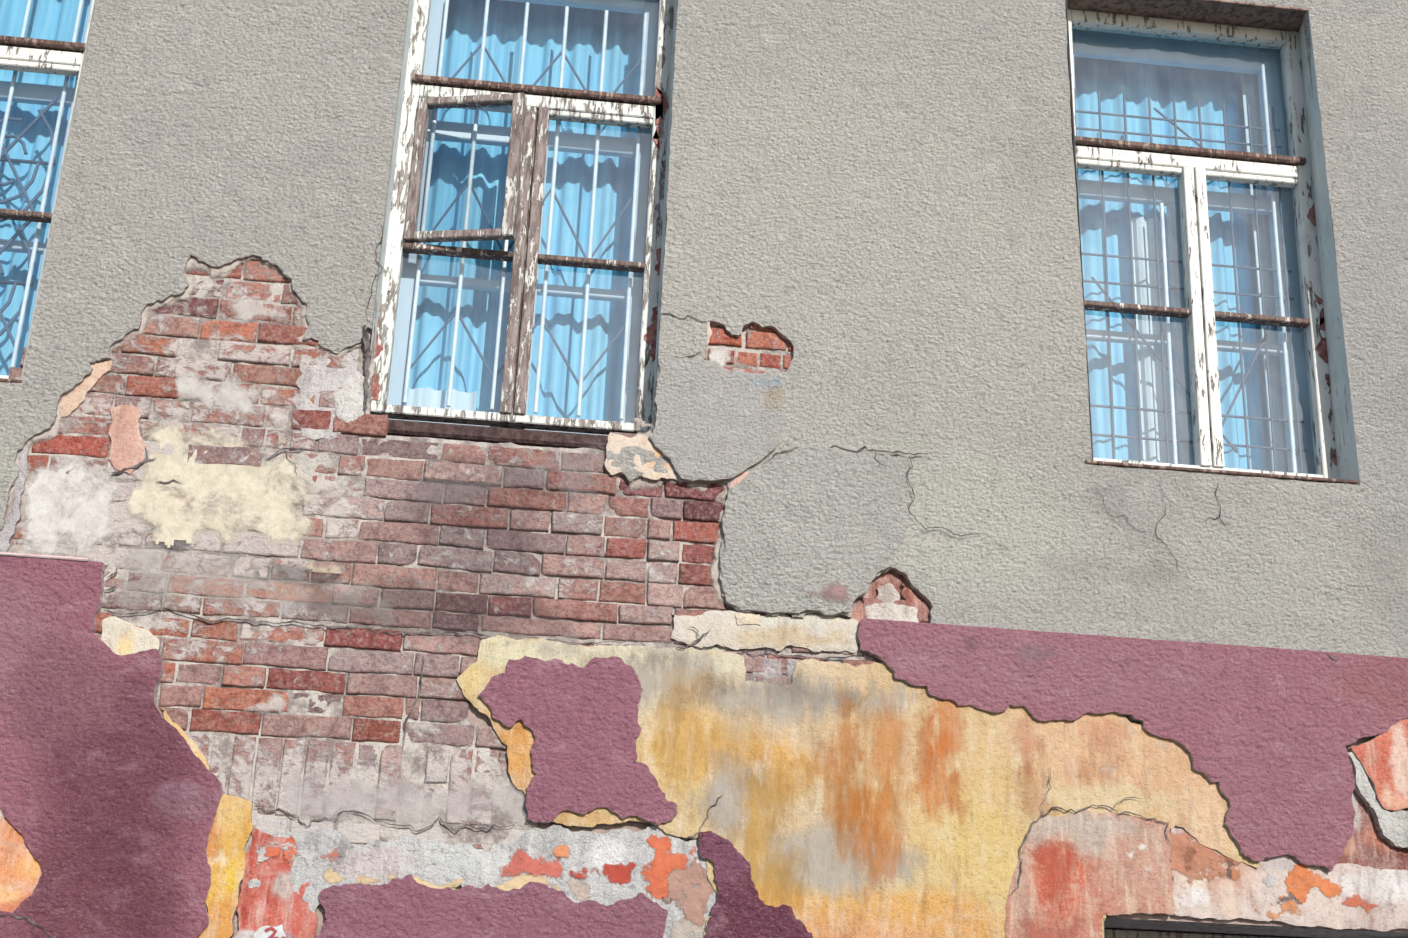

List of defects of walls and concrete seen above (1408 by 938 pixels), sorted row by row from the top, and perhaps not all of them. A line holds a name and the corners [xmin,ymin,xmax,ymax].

peeling [653,87,669,150]
peeling [1307,203,1316,227]
crack [763,445,989,536]
crack [1096,480,1180,572]
crack [1202,486,1231,525]
flaking render [0,256,1408,938]